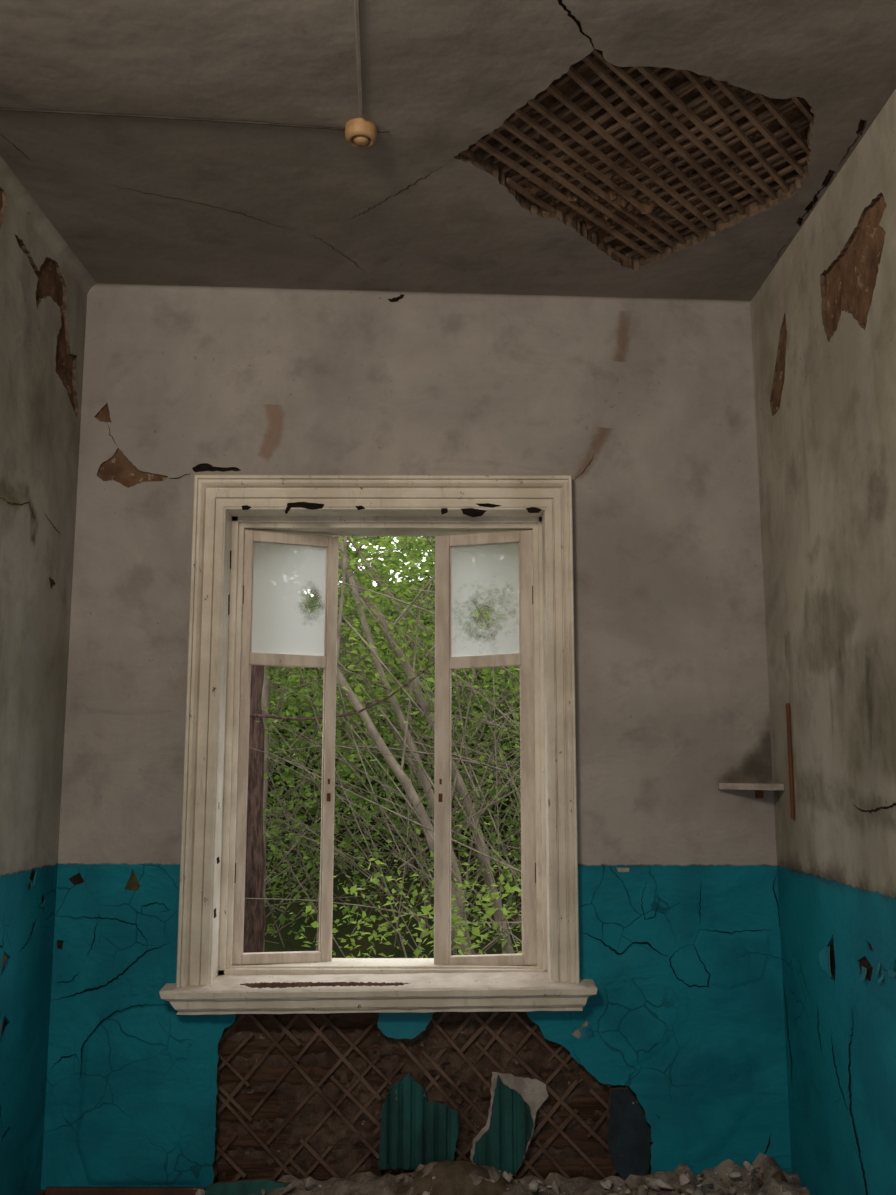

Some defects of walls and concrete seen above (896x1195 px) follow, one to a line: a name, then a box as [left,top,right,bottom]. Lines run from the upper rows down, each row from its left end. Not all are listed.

crack [558,0,595,50]
flaking render [14,234,79,419]
flaking render [454,49,815,270]
crack [771,119,867,267]
flaking render [820,192,887,342]
crack [2,498,61,534]
flaking render [94,403,111,422]
flaking render [97,448,168,488]
crack [854,803,896,813]
crack [52,902,173,1078]
crack [582,875,780,988]
flaking render [212,1011,622,1184]